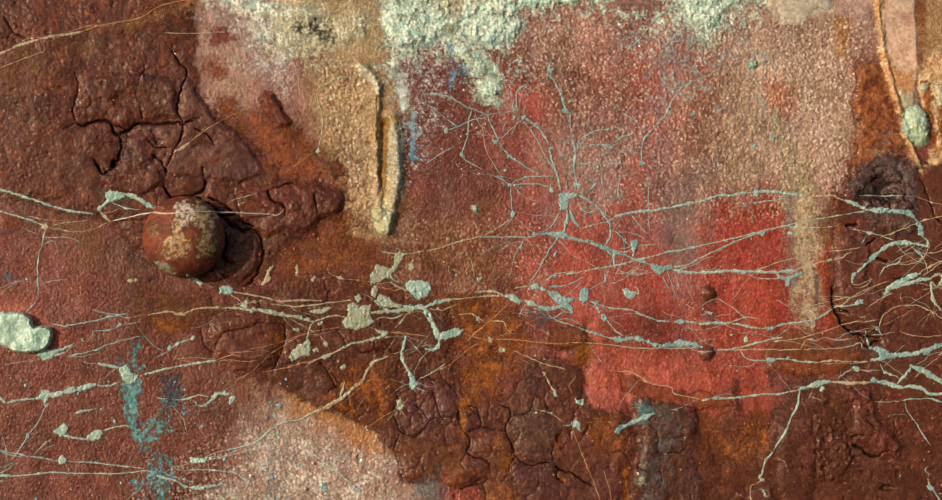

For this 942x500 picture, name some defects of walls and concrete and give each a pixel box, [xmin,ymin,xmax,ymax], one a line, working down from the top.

crack [63,50,265,288]
water stain [189,0,824,330]
water stain [129,373,188,500]
crack [200,297,288,370]
water stain [193,422,443,500]
rust [269,311,408,426]
crack [336,328,392,354]
rust [387,283,530,439]
crack [393,363,594,500]
rust [583,413,633,500]